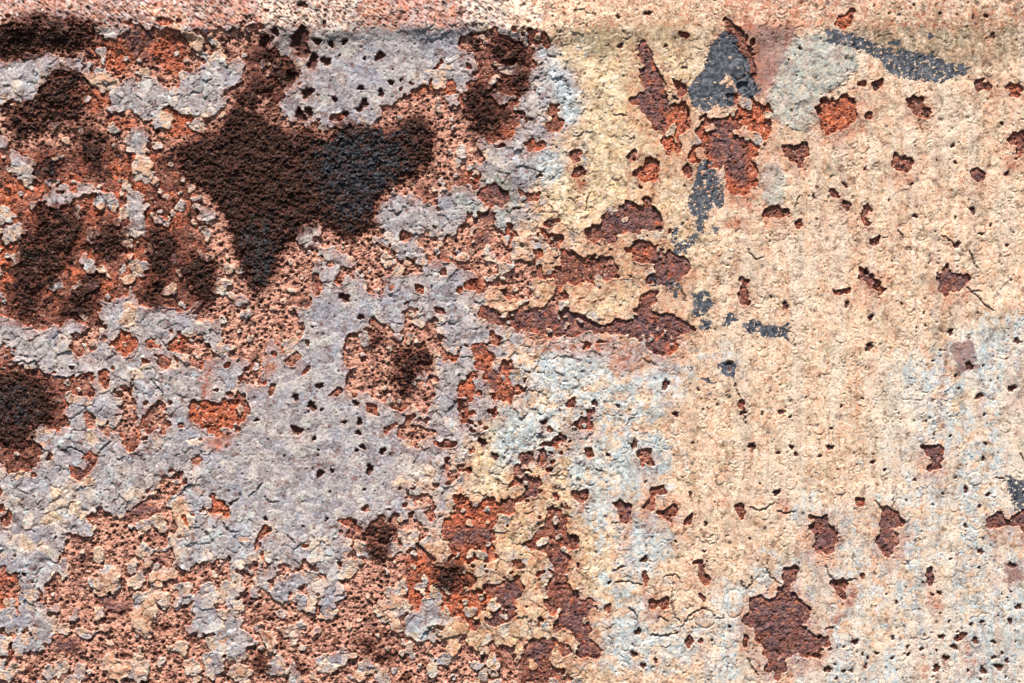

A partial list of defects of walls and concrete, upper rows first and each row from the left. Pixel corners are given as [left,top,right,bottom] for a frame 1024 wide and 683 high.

corrosion [453,28,541,148]
peeling [811,74,887,140]
corrosion [0,8,441,330]
peeling [932,240,974,302]
corrosion [351,318,437,406]
peeling [0,1,813,683]
corrosion [521,332,647,381]
corrosion [0,361,69,458]
corrosion [421,554,477,602]
peeling [805,511,843,562]
peeling [728,561,1010,683]
peeling [852,494,911,562]